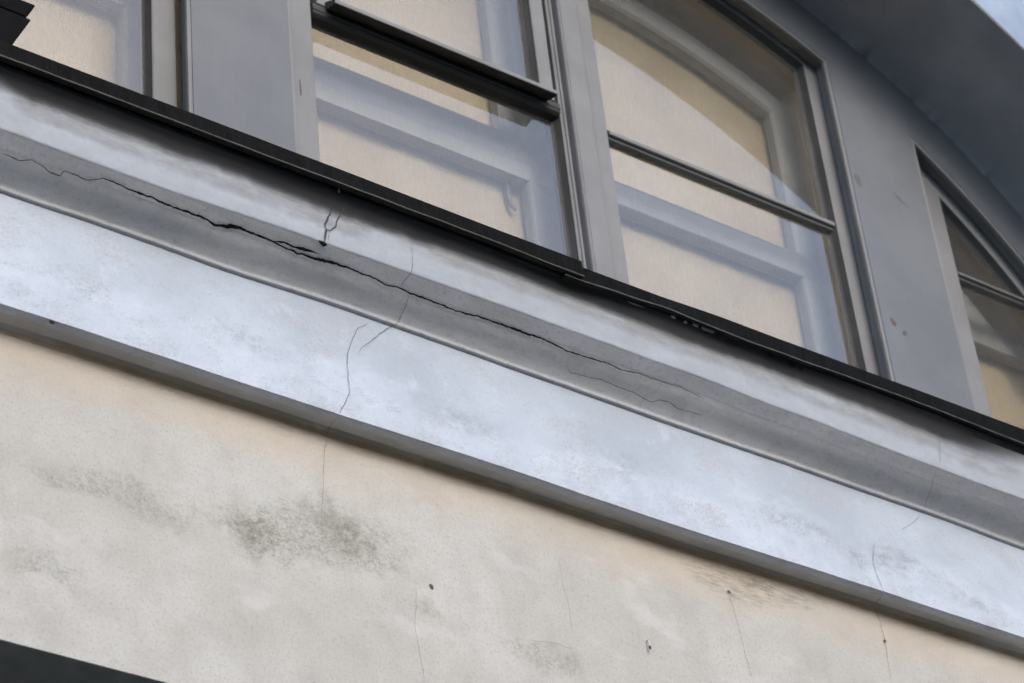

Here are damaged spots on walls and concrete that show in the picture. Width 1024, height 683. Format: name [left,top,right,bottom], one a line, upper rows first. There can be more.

crack [4,154,703,515]